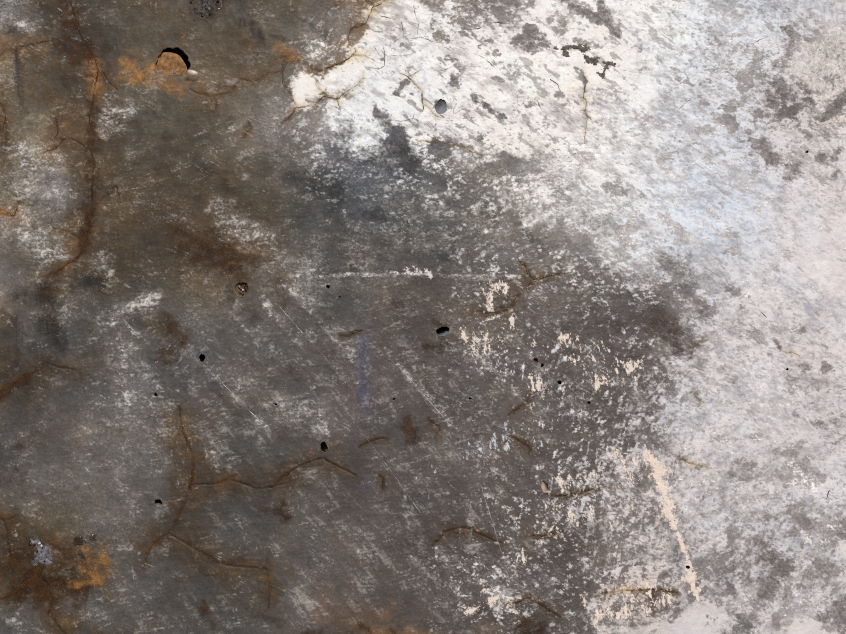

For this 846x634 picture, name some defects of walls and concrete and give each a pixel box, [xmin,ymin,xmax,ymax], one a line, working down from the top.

crack [276,3,460,121]
crack [56,0,119,272]
crack [175,468,194,522]